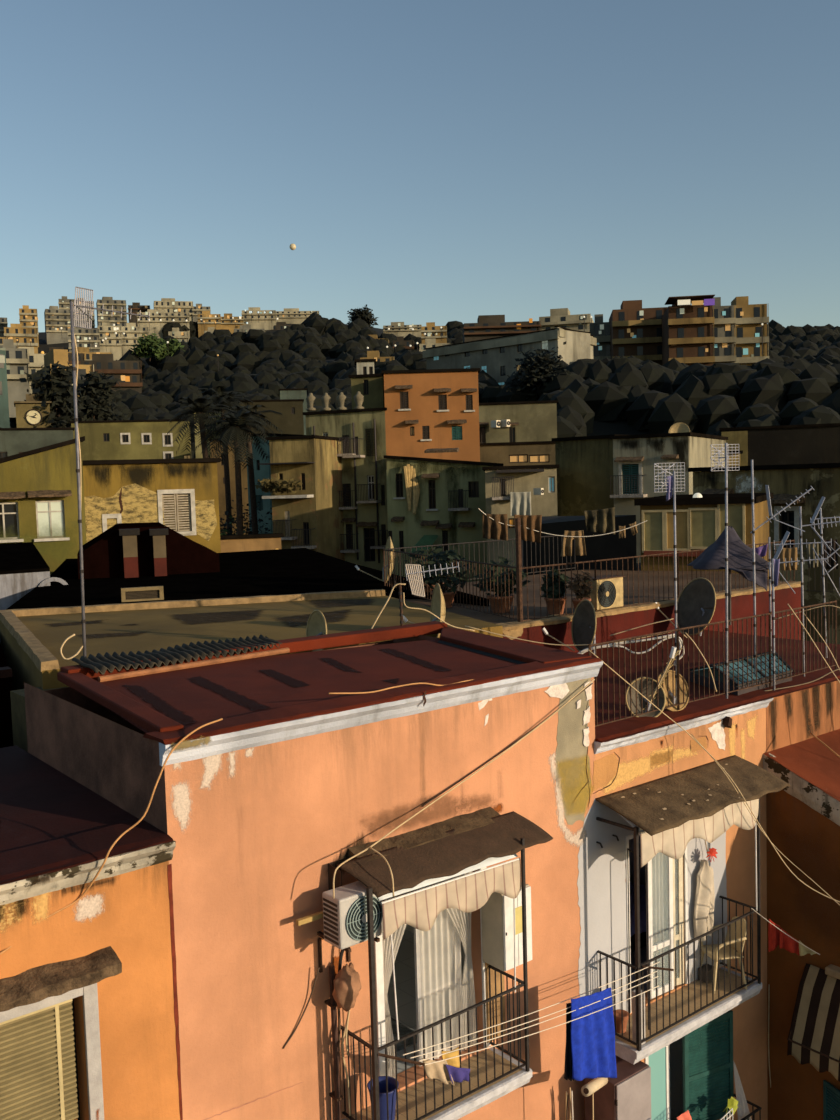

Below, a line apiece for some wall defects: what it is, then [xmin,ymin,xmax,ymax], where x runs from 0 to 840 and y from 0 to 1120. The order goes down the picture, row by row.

damp [771,682,833,750]
peeling [172,748,254,829]
peeling [544,678,593,846]
damp [0,874,50,931]
damp [62,878,115,893]